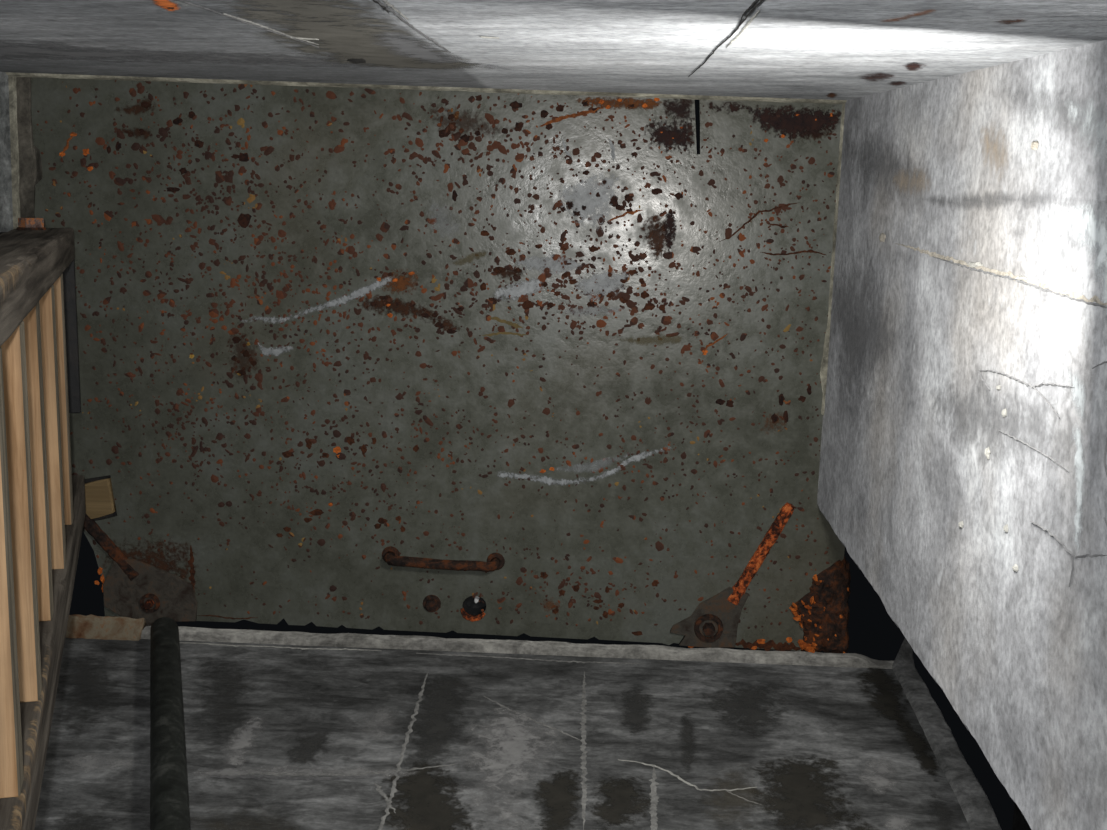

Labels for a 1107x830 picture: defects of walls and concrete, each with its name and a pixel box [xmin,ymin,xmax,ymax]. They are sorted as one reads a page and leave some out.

crack [688,0,763,77]
corrosion [862,74,906,86]
corrosion [903,63,926,71]
corrosion [433,109,524,142]
corrosion [540,97,695,153]
corrosion [709,93,841,142]
corrosion [560,201,586,216]
corrosion [596,180,677,258]
corrosion [362,272,459,334]
corrosion [493,267,522,278]
corrosion [541,271,578,308]
corrosion [608,270,665,311]